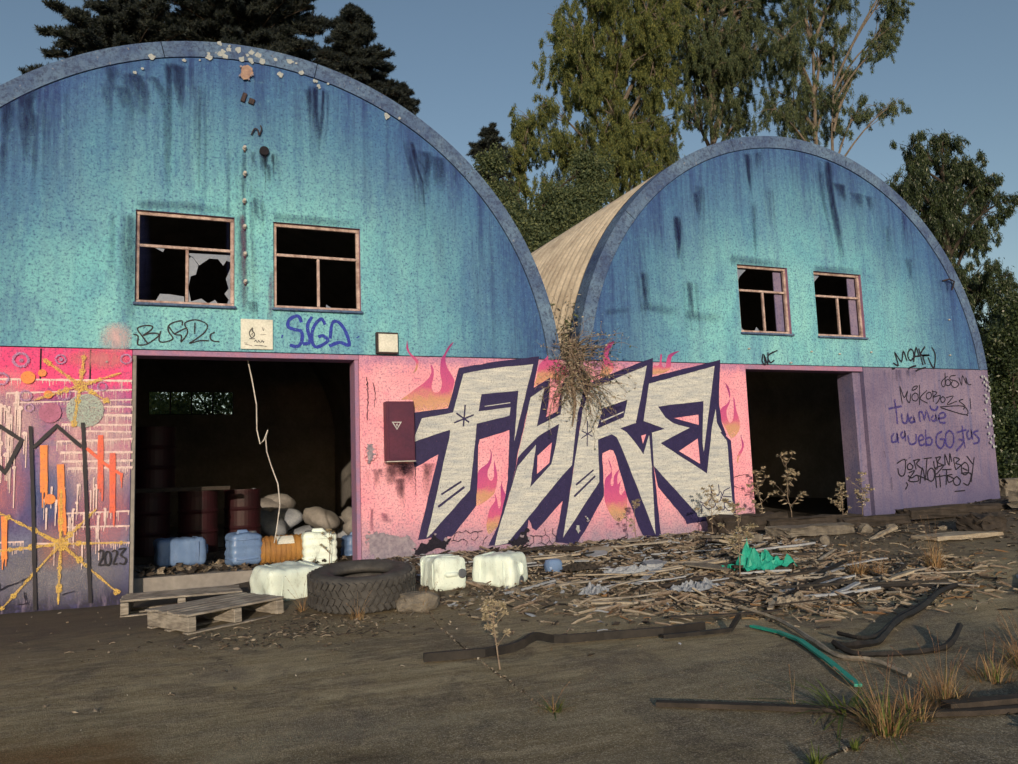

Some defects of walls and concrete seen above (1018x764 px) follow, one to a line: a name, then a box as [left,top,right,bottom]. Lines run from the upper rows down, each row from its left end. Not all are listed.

spalling [239,65,254,81]
water stain [826,163,844,234]